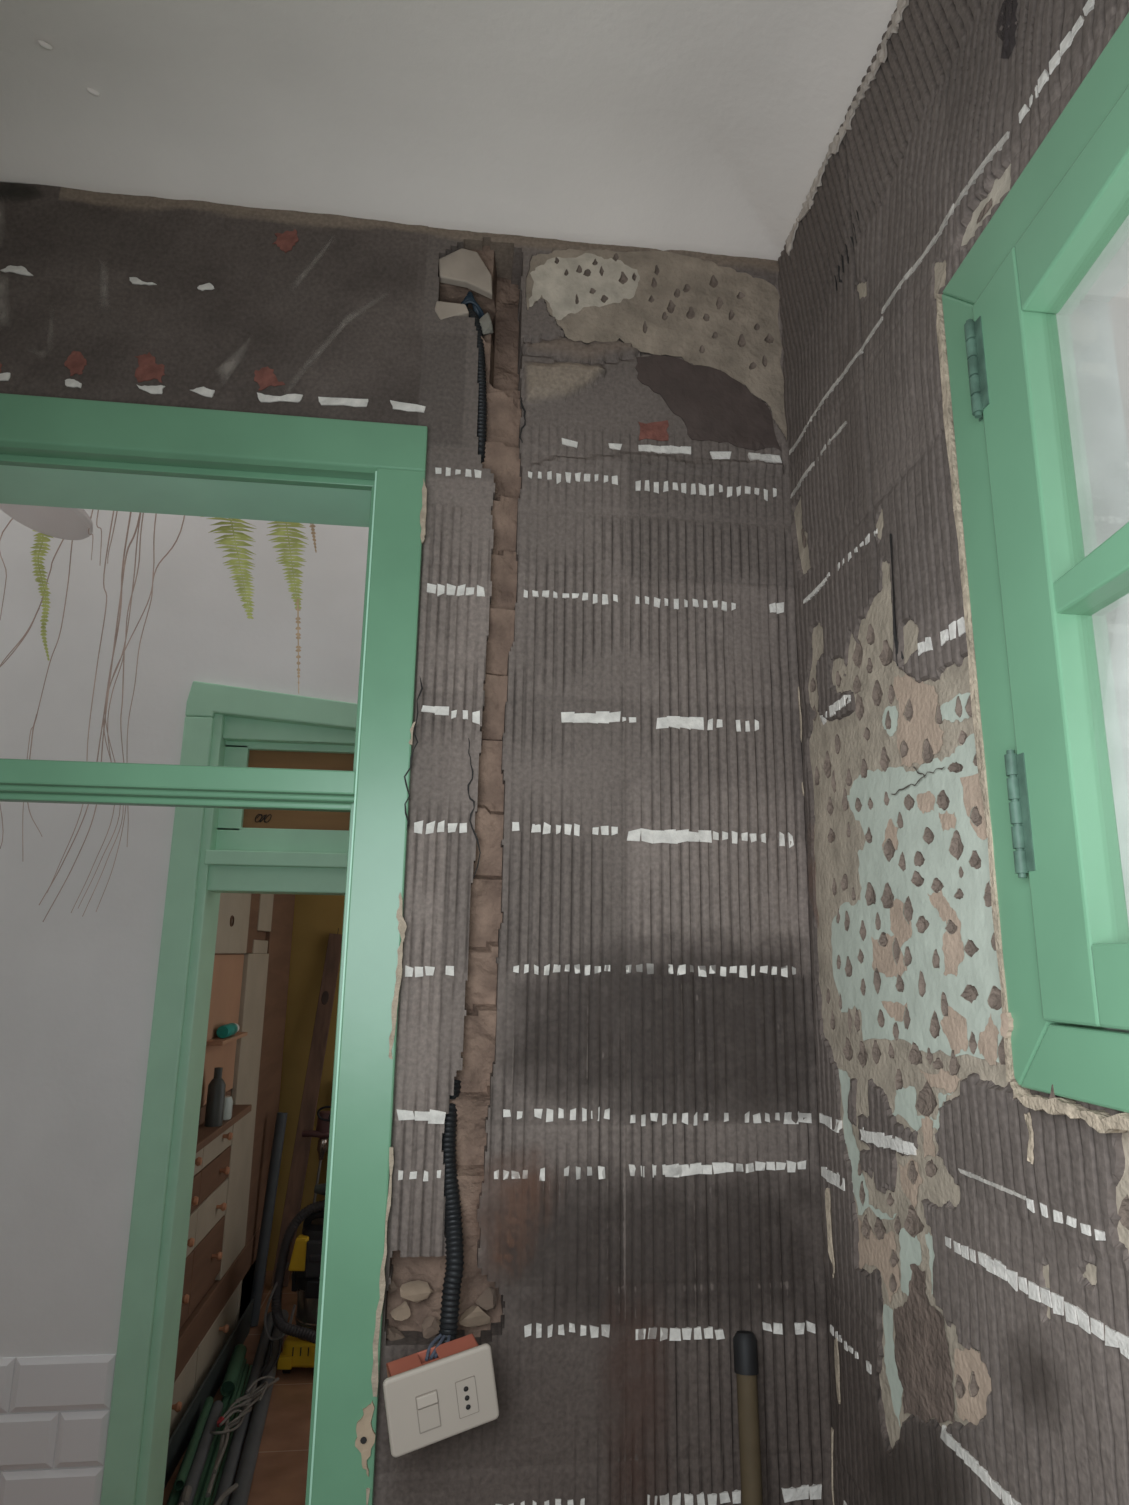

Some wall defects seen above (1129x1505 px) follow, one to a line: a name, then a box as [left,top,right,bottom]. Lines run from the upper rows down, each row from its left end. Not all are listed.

flaking render [526,249,787,441]
crack [518,397,526,443]
peeling [528,471,777,501]
crack [404,678,423,831]
crack [467,738,481,879]
peeling [512,822,618,836]
peeling [762,260,1129,1449]
peeling [513,963,796,978]
peeling [503,1107,610,1122]
peeling [524,1323,610,1338]
peeling [635,1326,725,1341]
peeling [647,1490,741,1505]